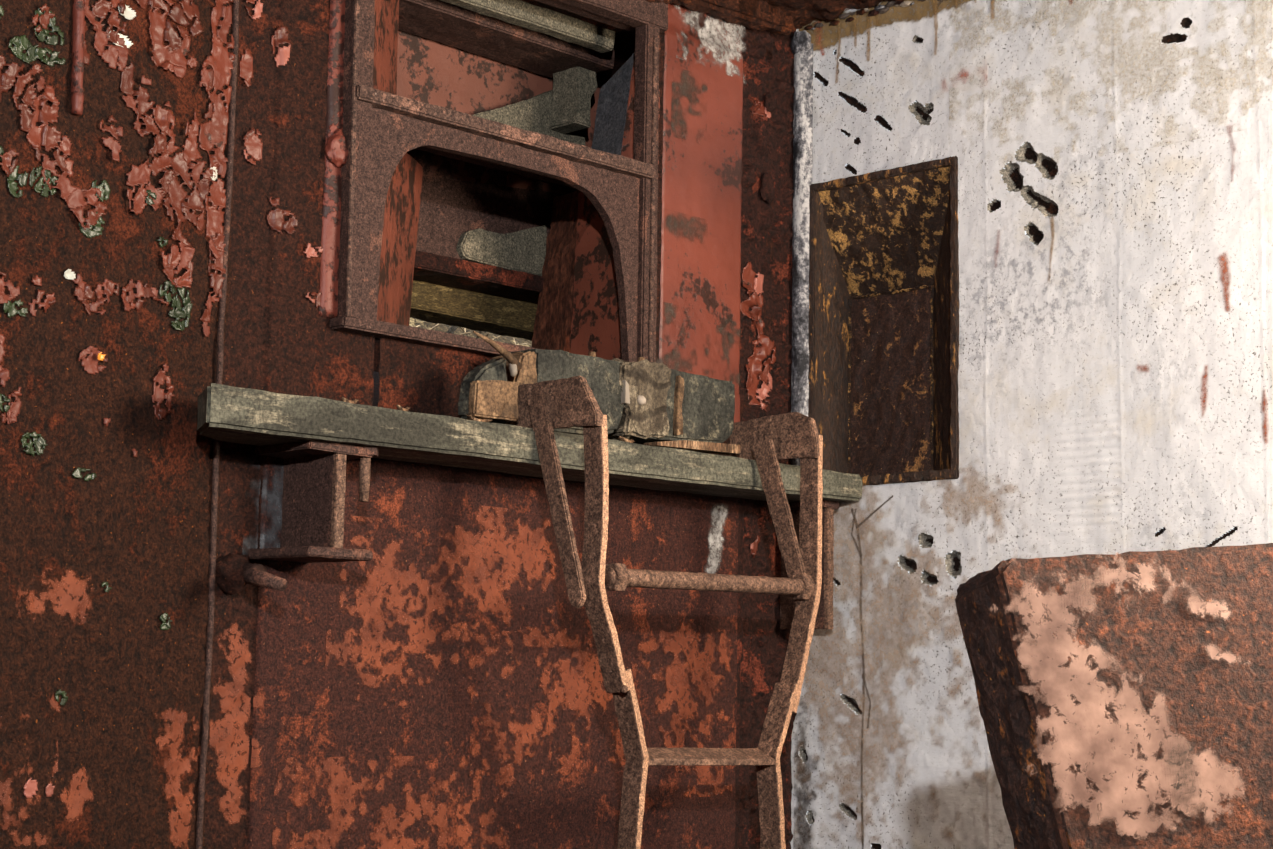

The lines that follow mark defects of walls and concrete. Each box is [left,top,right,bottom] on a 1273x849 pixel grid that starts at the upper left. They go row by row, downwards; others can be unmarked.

leakage [799,0,976,83]
peeling [0,3,111,238]
peeling [64,0,263,337]
spalling [987,141,1058,278]
peeling [0,272,56,318]
corrosion [1220,254,1230,311]
peeling [0,334,47,456]
corrosion [18,568,92,624]
spalling [897,533,962,586]
corrosion [156,624,265,849]
corrosion [272,506,626,849]
corrosion [631,619,731,748]